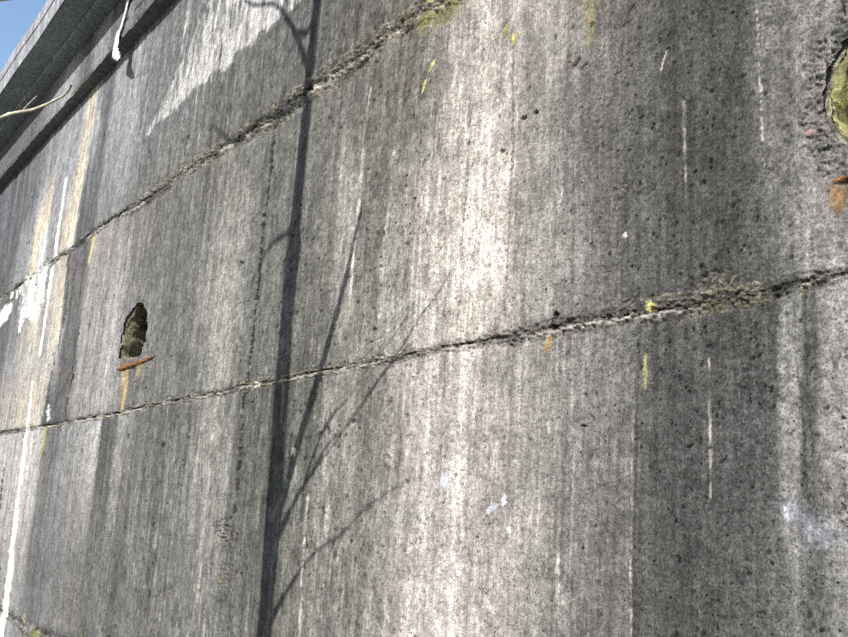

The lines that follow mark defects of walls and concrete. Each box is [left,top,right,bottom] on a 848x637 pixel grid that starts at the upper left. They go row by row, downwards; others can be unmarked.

water stain [0,22,173,637]
corrosion [117,355,155,412]
crack [0,0,447,520]
water stain [324,0,637,637]
crack [548,186,564,237]
crack [521,277,813,336]
water stain [745,0,848,637]
corrosion [830,174,848,213]